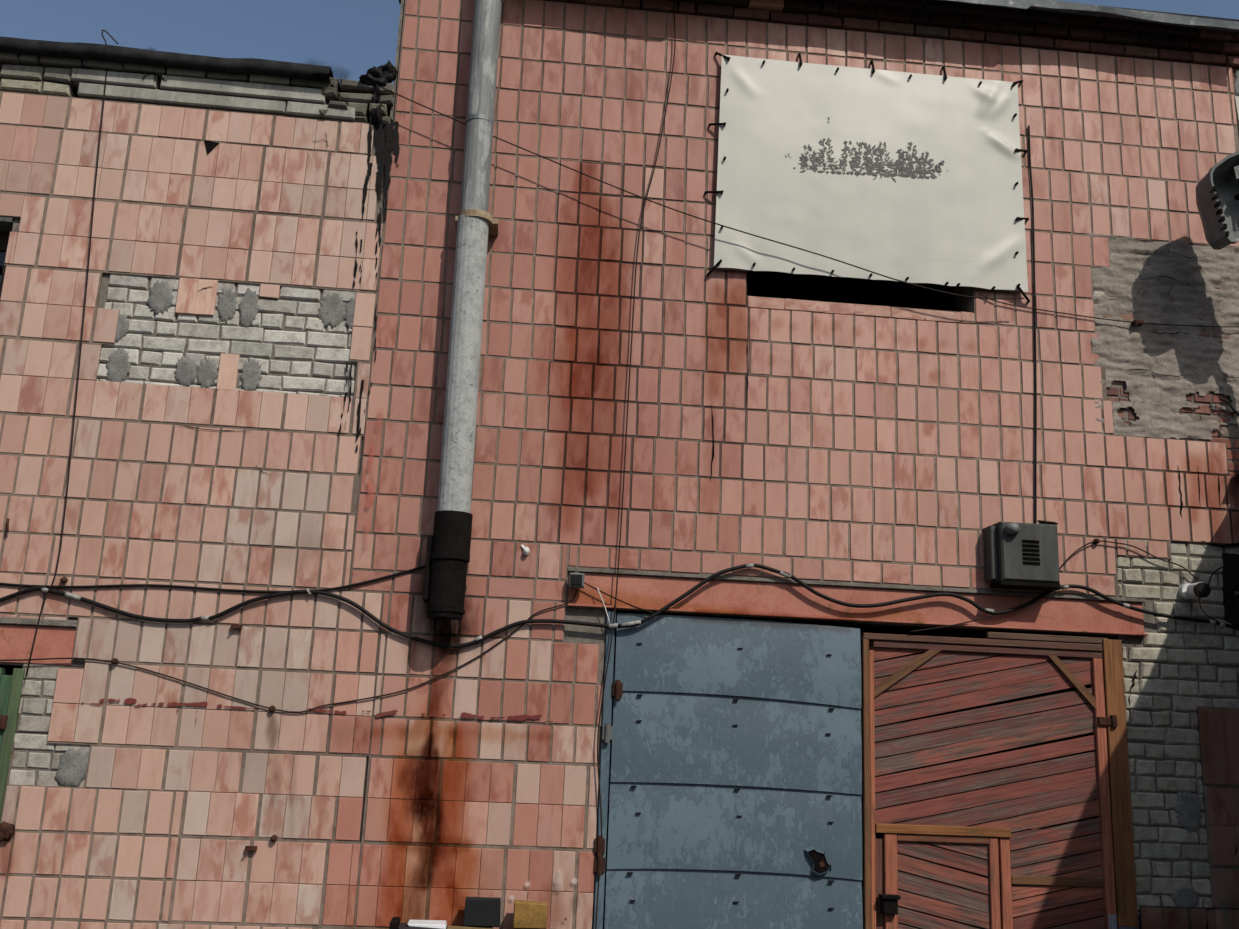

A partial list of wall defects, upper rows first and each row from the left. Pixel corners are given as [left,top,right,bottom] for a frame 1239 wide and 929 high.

spalling [97,273,356,398]
leakage [338,119,400,452]
peeling [1085,233,1239,476]
spalling [9,663,90,787]
corrosion [411,736,440,882]
spalling [1116,539,1239,916]